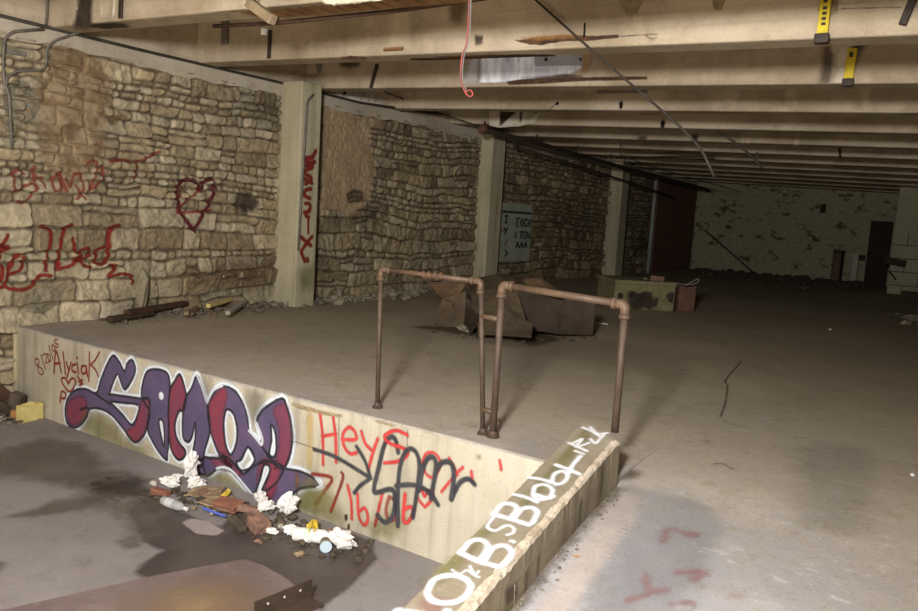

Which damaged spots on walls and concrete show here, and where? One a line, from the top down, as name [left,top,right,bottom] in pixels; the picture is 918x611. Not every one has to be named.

leakage [74,0,127,30]
spalling [266,0,468,17]
leakage [822,46,833,81]